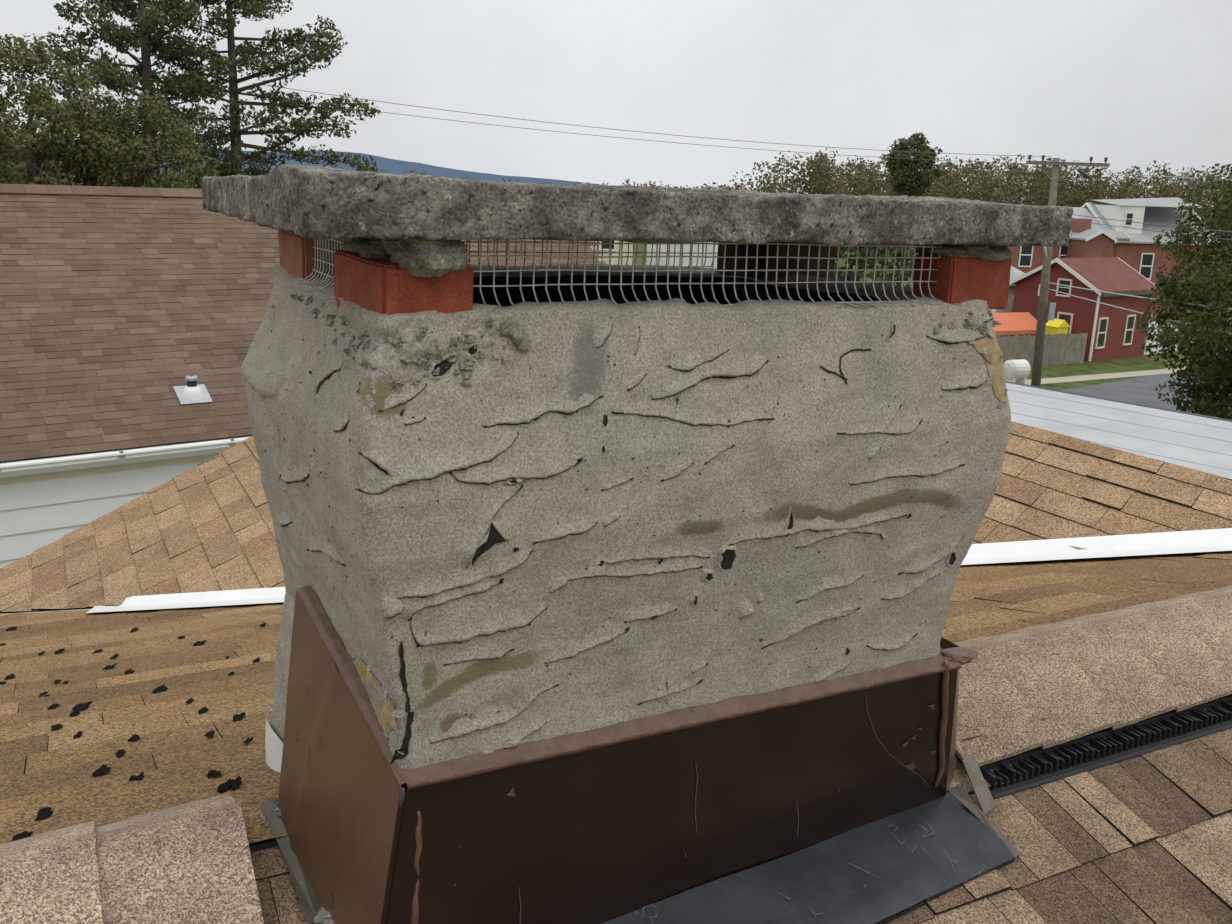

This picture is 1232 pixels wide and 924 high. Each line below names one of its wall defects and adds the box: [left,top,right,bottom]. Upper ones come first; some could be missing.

spalling [268,292,507,387]
crack [926,302,994,391]
crack [275,436,345,590]
crack [315,320,965,764]
water stain [681,521,721,534]
water stain [768,489,954,522]
peeling [351,652,419,741]
water stain [424,654,533,705]